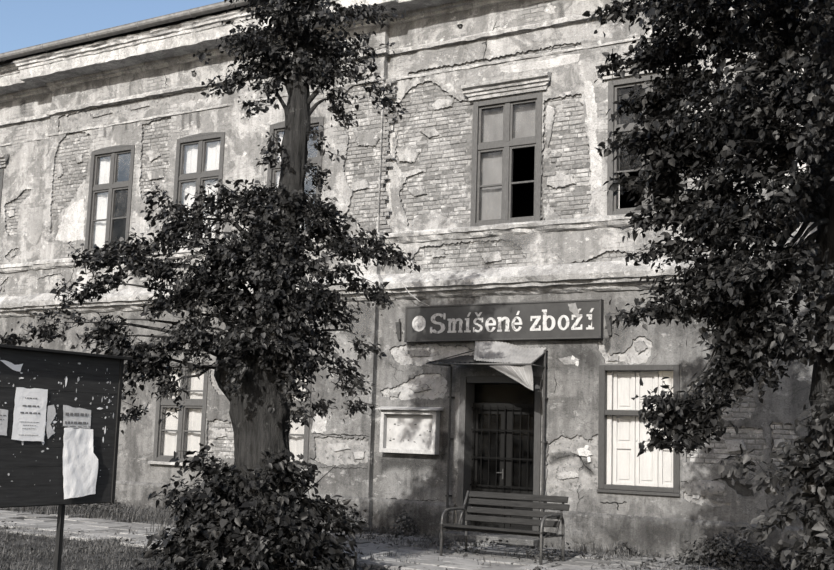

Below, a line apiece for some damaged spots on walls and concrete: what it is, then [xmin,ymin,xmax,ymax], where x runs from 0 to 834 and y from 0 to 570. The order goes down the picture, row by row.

spalling [51,89,210,242]
spalling [344,43,582,235]
spalling [542,78,602,221]
spalling [5,189,31,236]
spalling [412,239,527,272]
spalling [574,250,640,263]
spalling [381,343,474,400]
peeling [598,336,652,365]
spalling [311,413,372,466]
spalling [686,376,799,468]
spalling [684,491,731,507]
spalling [722,475,754,497]